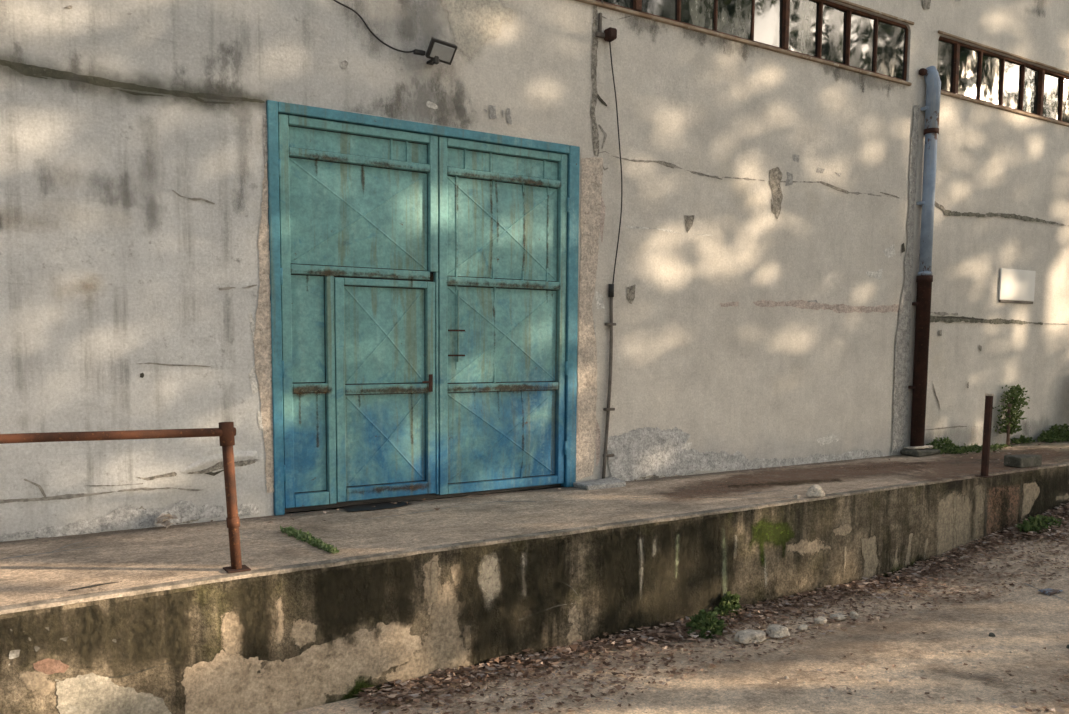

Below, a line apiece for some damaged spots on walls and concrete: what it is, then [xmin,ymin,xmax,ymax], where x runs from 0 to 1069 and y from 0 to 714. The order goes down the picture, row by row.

leakage [0,58,263,106]
crack [590,0,899,198]
crack [935,201,1066,226]
flaking render [576,105,920,481]
crack [930,312,1068,325]
crack [0,459,260,504]
flaking render [178,554,473,714]
leakage [315,560,438,644]
leakage [454,539,573,669]
leakage [596,517,737,643]
flaking render [19,658,172,714]
leakage [352,676,366,698]